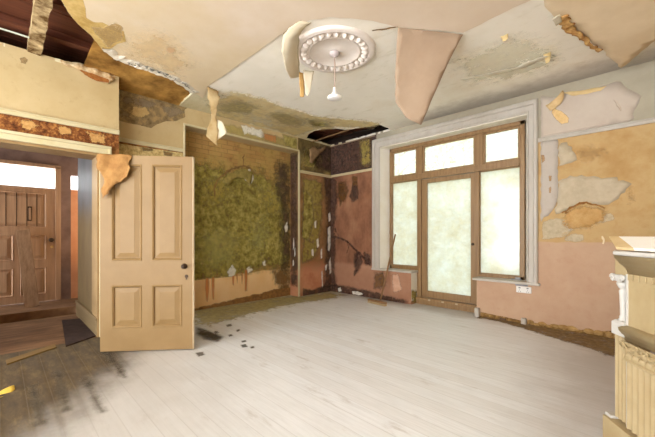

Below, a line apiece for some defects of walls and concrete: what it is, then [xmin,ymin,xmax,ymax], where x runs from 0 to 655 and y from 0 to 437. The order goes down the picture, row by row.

spalling [60,40,199,128]
leakage [194,93,378,341]
flaking render [542,175,631,242]
leakage [103,352,124,376]
leakage [477,316,615,356]